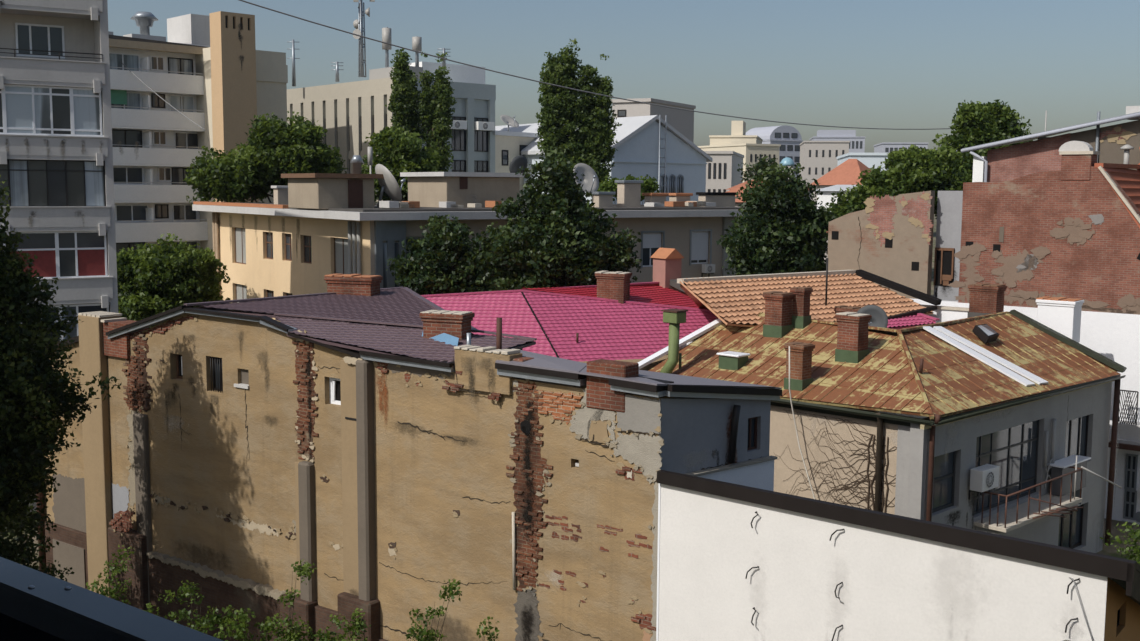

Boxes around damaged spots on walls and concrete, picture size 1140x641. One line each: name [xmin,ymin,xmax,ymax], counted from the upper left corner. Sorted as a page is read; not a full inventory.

peeling [863,191,933,247]
peeling [959,214,1104,301]
peeling [292,330,319,463]
crack [398,422,468,442]
peeling [150,490,296,539]
peeling [488,379,665,641]